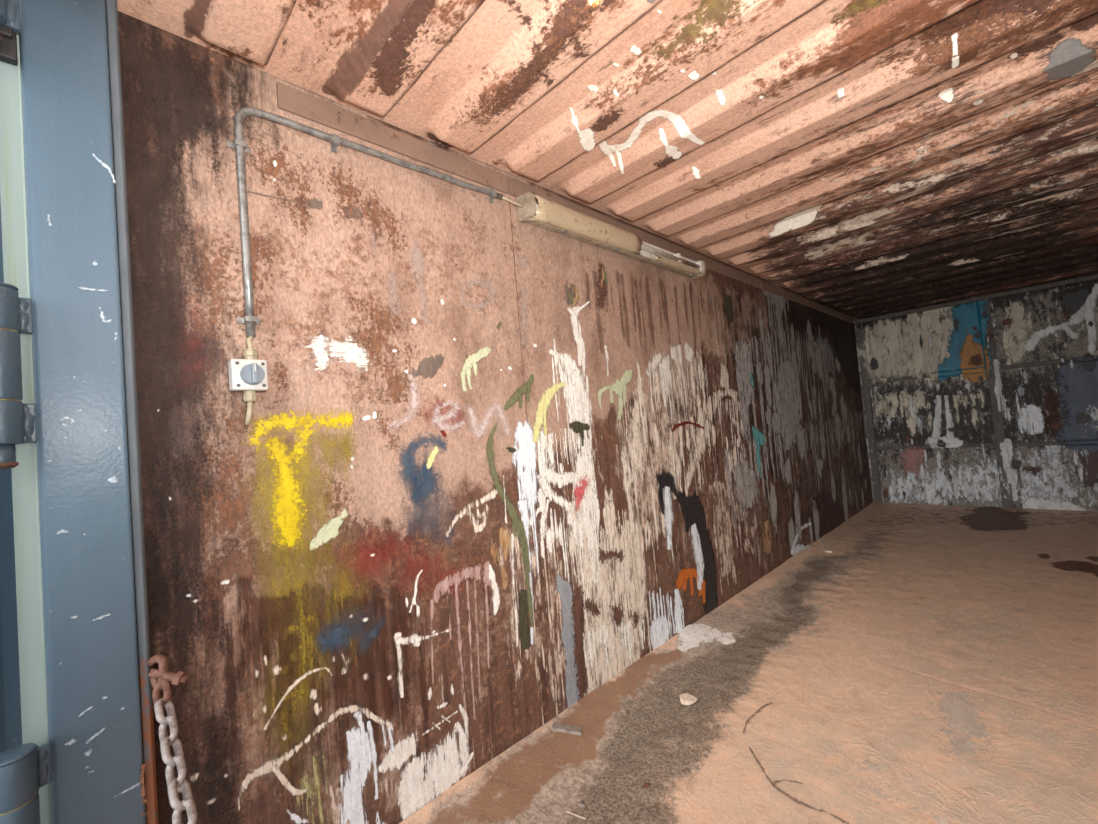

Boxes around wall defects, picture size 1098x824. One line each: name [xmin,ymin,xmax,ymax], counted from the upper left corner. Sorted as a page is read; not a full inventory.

corrosion [206,43,259,71]
corrosion [282,0,341,51]
corrosion [350,0,475,97]
corrosion [452,0,623,134]
peeling [1051,130,1098,157]
peeling [864,175,928,198]
peeling [801,211,923,244]
peeling [855,254,909,271]
peeling [858,306,959,386]
peeling [881,459,1037,507]
damp [649,485,718,642]
damp [1038,554,1098,576]